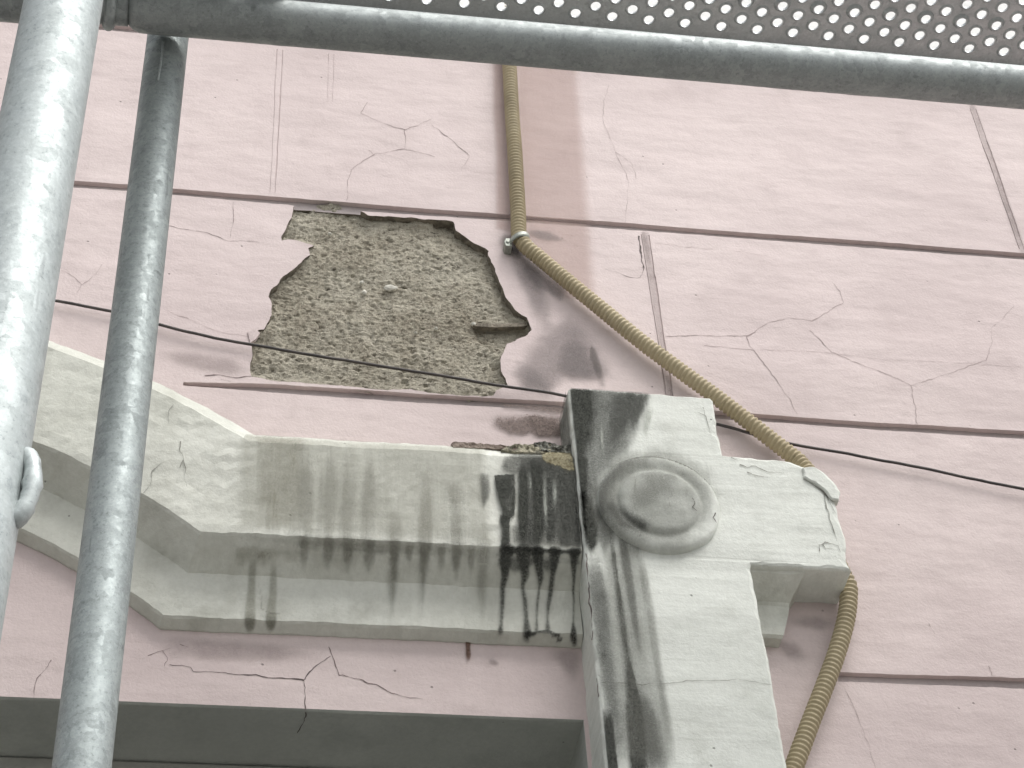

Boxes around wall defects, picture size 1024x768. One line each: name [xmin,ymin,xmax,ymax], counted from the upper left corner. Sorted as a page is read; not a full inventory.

crack [346,103,469,201]
spalling [248,203,532,402]
crack [666,284,1019,425]
spalling [451,441,571,455]
leakage [481,389,661,768]
crack [148,644,420,733]